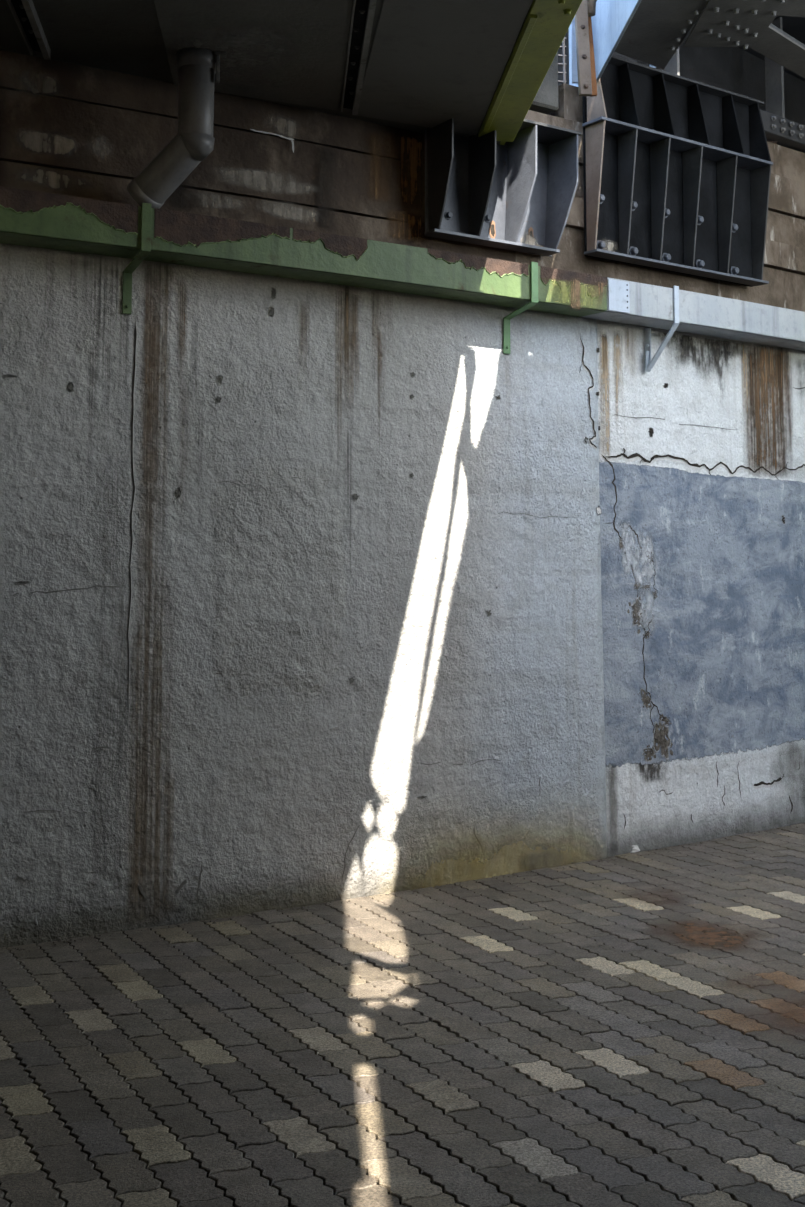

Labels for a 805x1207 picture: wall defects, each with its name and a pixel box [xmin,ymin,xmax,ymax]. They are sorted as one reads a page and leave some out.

peeling [0,187,138,235]
peeling [154,208,368,261]
rust [601,332,629,453]
rust [742,345,791,472]
crack [579,334,805,741]
flaking render [627,581,658,639]
flaking render [639,688,673,762]
crack [753,774,784,789]